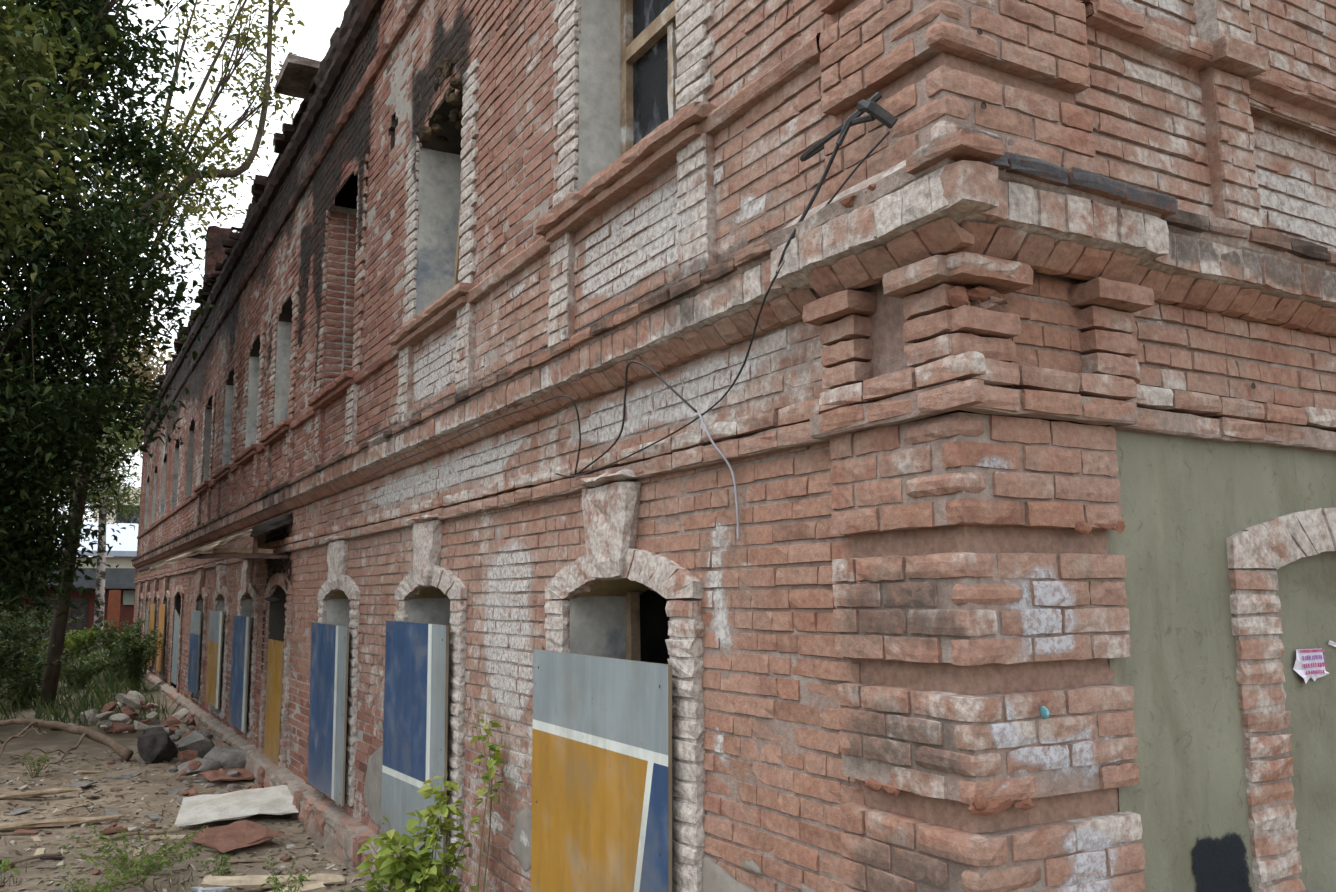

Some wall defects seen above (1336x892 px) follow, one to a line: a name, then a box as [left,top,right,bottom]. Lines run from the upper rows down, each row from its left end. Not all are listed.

leakage [357,139,370,249]
leakage [298,223,323,381]